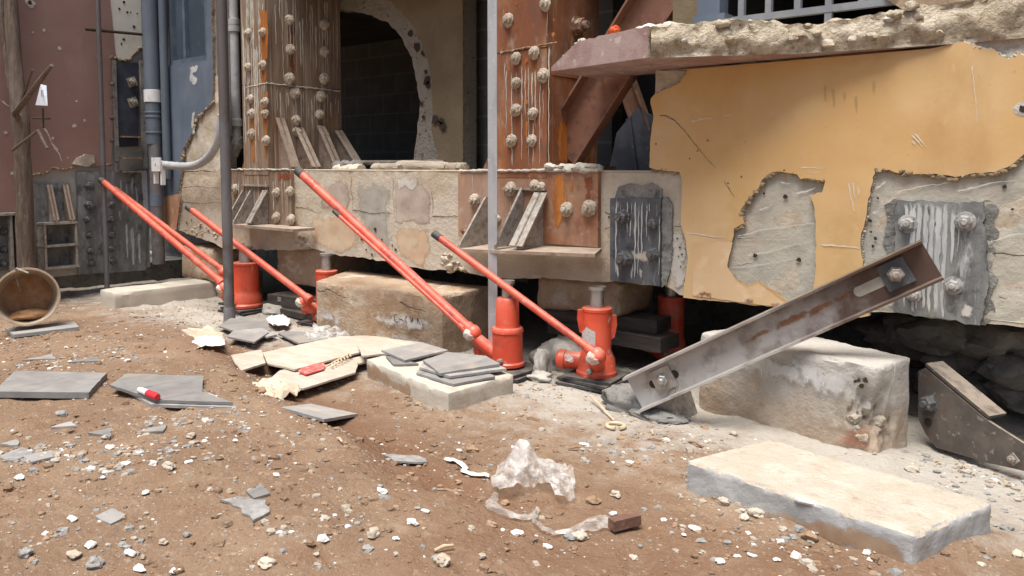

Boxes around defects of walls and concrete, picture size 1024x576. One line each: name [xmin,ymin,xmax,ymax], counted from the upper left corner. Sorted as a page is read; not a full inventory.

corrosion [250,9,268,163]
spalling [796,23,879,48]
spalling [884,0,924,23]
flaking render [964,39,1024,59]
flaking render [178,76,230,239]
peeling [295,178,430,265]
spalling [440,252,468,273]
corrosion [552,121,593,227]
leakage [615,202,660,278]
flaking render [727,169,825,300]
leakage [903,203,970,317]
flaking render [861,155,1024,324]